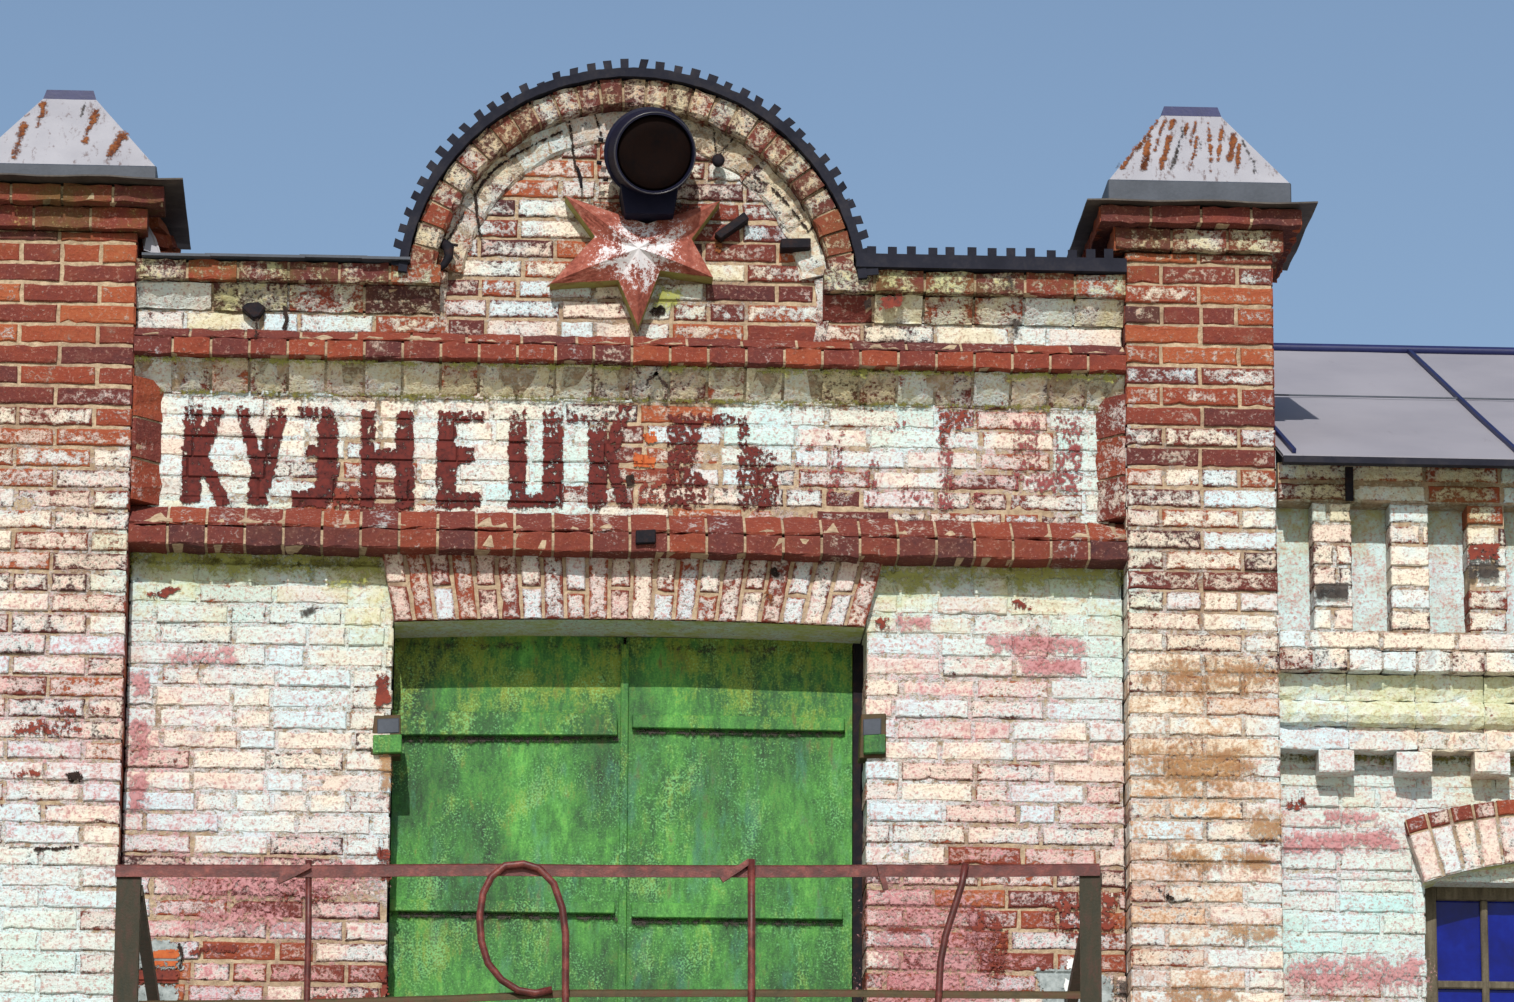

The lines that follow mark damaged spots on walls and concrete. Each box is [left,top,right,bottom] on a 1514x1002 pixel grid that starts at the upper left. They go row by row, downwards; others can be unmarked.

rust [11,101,48,160]
rust [80,105,100,144]
rust [106,131,129,159]
rust [1116,117,1256,173]
crack [447,114,602,240]
spalling [649,286,681,318]
peeling [938,409,974,455]
peeling [331,486,362,507]
peeling [866,859,1016,1002]
peeling [1101,885,1125,937]